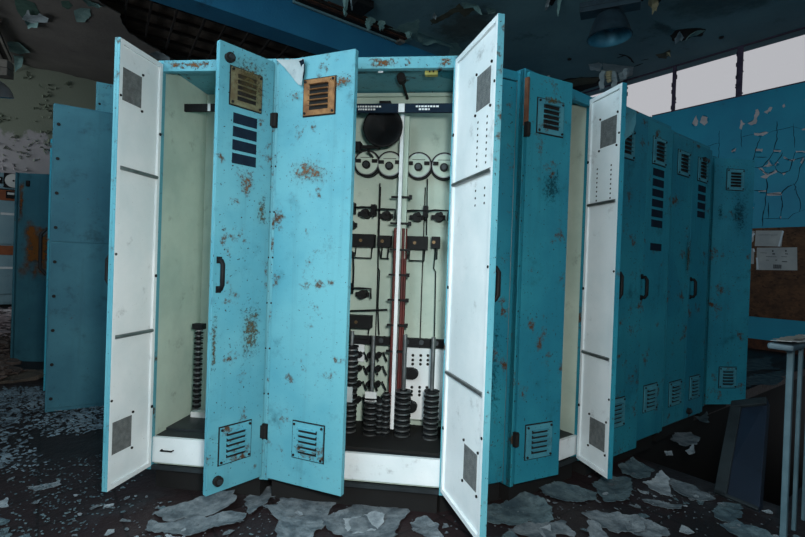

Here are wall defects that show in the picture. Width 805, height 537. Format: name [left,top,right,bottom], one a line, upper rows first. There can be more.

peeling [15,0,49,29]
peeling [390,19,463,56]
peeling [149,51,170,61]
peeling [692,115,709,127]
peeling [739,107,772,137]
crack [741,124,805,226]